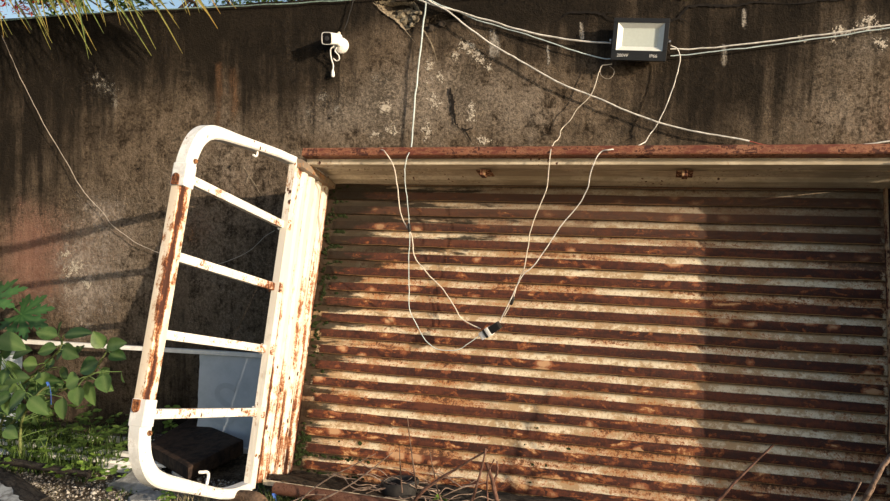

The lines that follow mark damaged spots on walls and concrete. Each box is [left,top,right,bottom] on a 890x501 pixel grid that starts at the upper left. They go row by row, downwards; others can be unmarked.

flaking render [374,0,468,32]
crack [448,88,472,142]